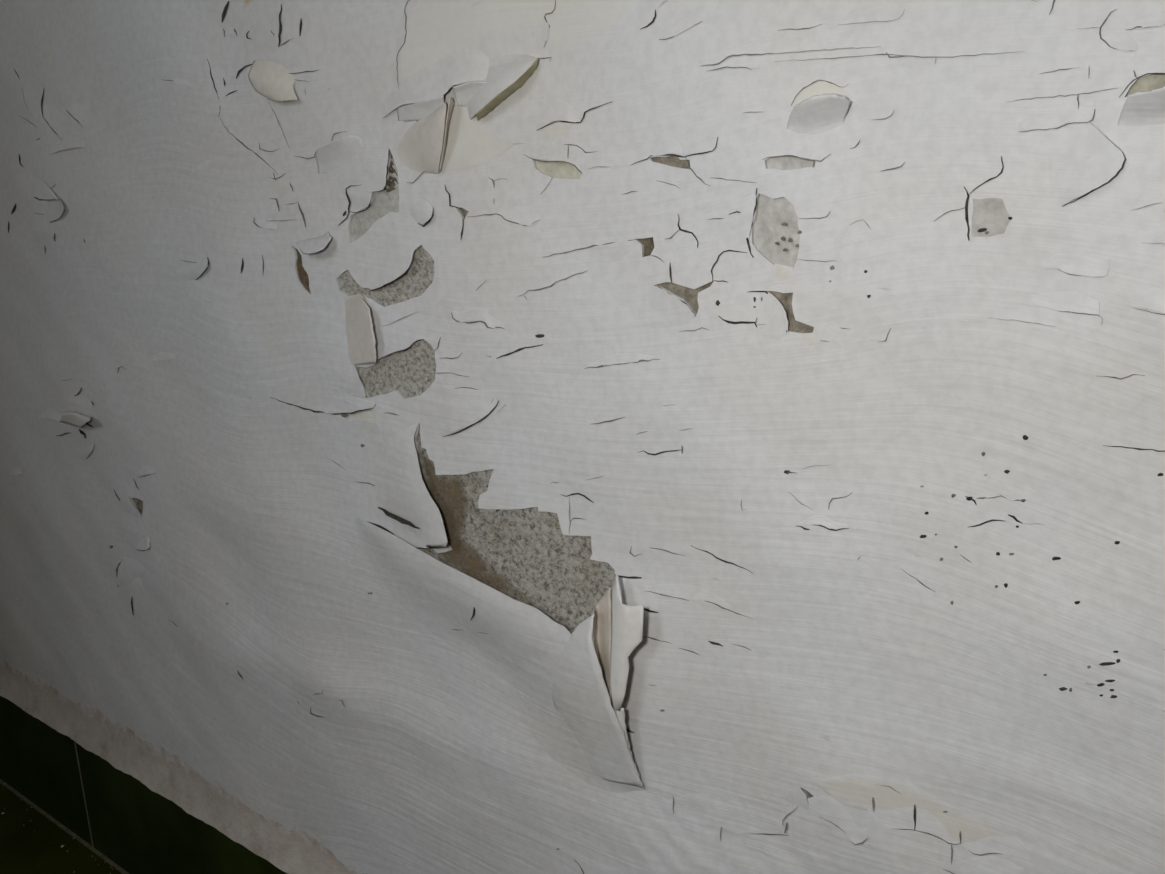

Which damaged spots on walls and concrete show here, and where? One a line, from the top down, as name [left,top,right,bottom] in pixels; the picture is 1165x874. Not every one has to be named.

crack [777,9,905,31]
peeling [383,0,643,174]
crack [1009,68,1117,107]
peeling [1117,70,1165,126]
crack [936,156,1012,241]
spalling [273,198,469,437]
spalling [638,188,819,347]
crack [793,259,835,282]
spalling [367,507,419,535]
spalling [416,433,645,790]
damp [0,658,368,874]
crack [663,773,1030,874]